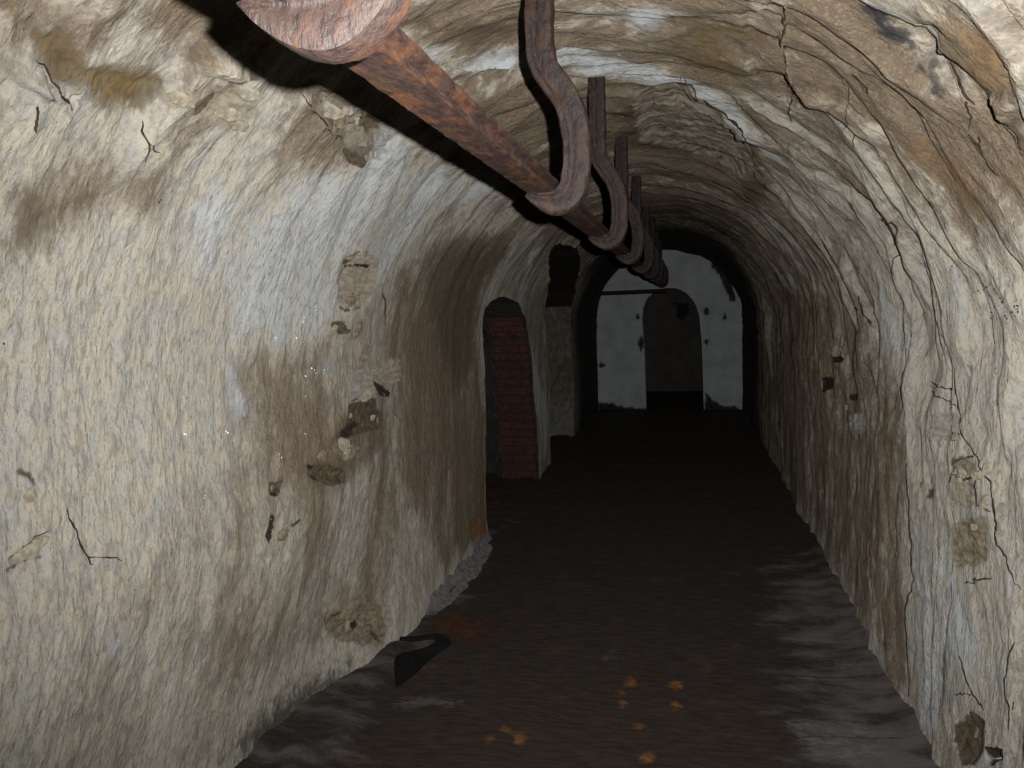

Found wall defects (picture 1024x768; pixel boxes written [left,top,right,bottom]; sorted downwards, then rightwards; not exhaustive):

crack [33,58,73,133]
crack [140,121,160,163]
crack [680,5,800,147]
crack [938,44,1024,176]
spalling [307,251,401,486]
crack [8,509,122,565]
spalling [324,590,393,645]
crack [904,463,914,696]
spalling [940,456,1006,584]
crack [930,366,1022,590]
spalling [954,705,1007,766]
crack [953,642,1015,731]